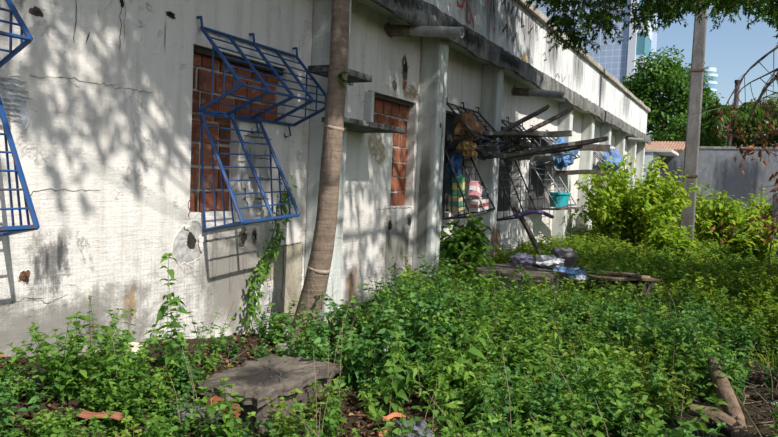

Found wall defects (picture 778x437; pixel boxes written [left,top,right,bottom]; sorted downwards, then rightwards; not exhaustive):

spalling [29,6,44,17]
crack [30,75,151,93]
spalling [170,197,220,266]
spalling [237,226,257,249]
spalling [17,269,32,284]
leakage [35,244,67,289]